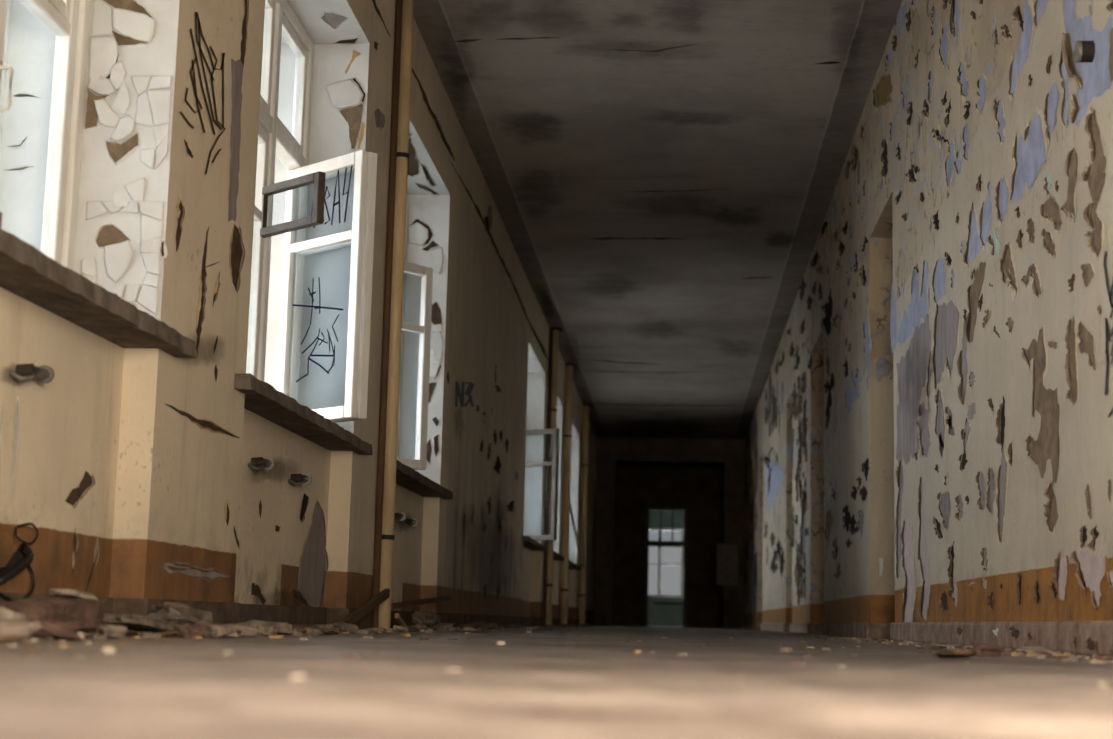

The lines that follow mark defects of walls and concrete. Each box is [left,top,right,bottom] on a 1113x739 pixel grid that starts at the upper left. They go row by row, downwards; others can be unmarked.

crack [240,0,249,67]
crack [367,0,391,37]
peeling [319,11,385,151]
peeling [81,0,172,318]
peeling [744,0,1113,623]
crack [165,404,240,438]
peeling [476,405,509,475]
peeling [65,471,96,508]
peeling [293,493,329,607]
peeling [992,625,1032,640]